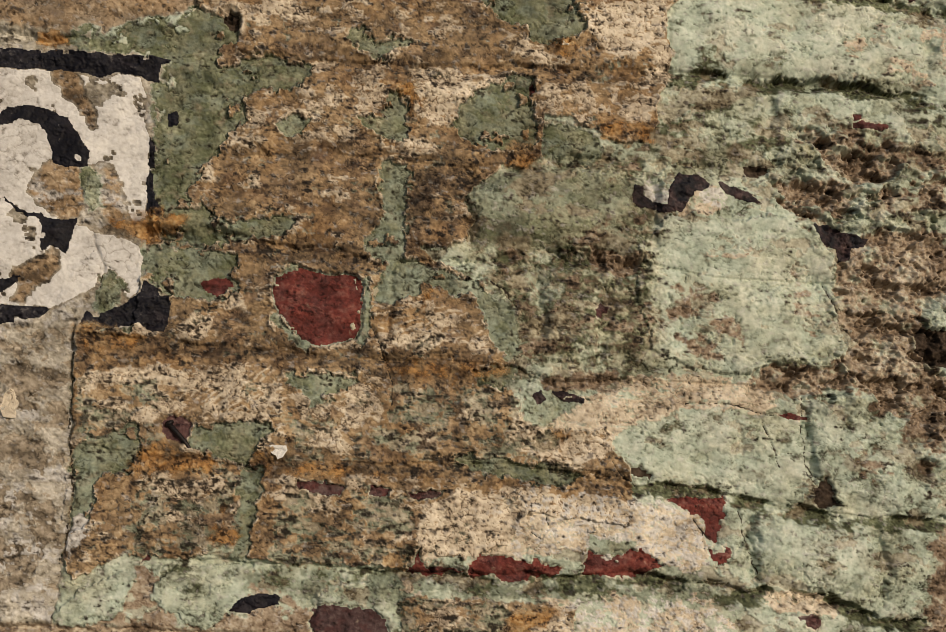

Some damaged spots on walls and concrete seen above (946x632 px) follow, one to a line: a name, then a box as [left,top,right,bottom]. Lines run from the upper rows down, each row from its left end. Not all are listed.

spalling [53,69,96,128]
peeling [66,7,316,302]
spalling [30,162,123,221]
spalling [12,251,58,303]
peeling [267,161,612,428]
crack [685,398,826,485]
peeling [189,415,287,560]
flaking render [296,480,345,496]
flaking render [407,551,562,582]
flaking render [581,529,662,579]
flaking render [667,494,732,568]
flaking render [309,604,388,632]